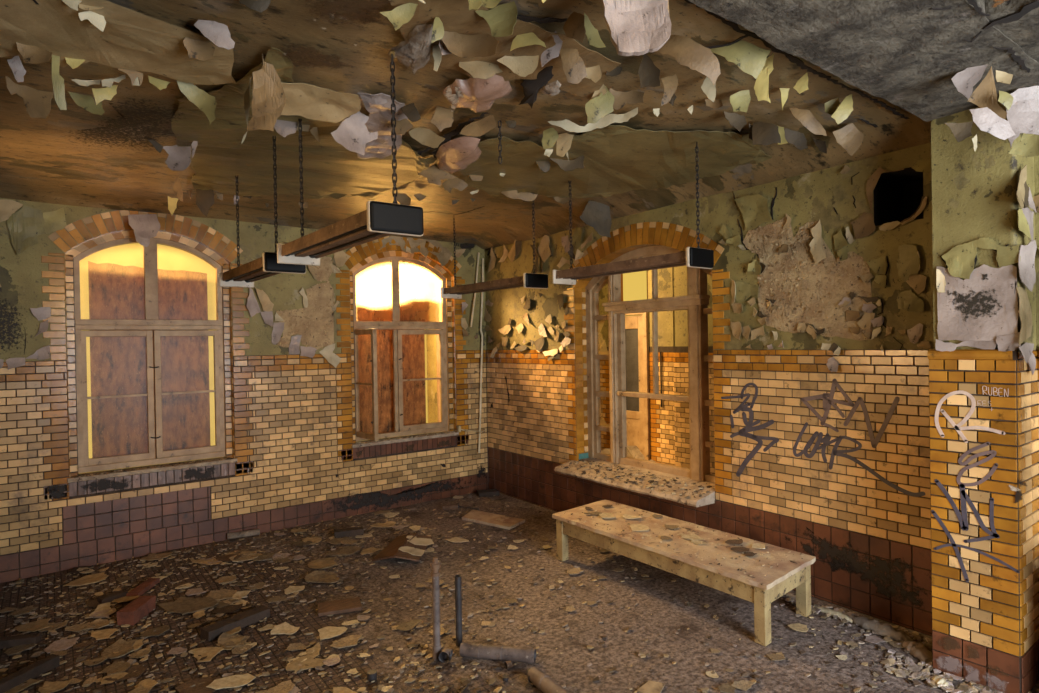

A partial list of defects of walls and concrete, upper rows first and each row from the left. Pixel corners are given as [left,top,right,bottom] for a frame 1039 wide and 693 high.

mould [65,92,185,155]
peeling [0,0,864,273]
peeling [719,64,1039,375]
leakage [0,299,32,352]
flaking render [246,250,351,368]
peeling [461,293,571,361]
mould [947,274,1002,322]
leakage [785,528,931,607]